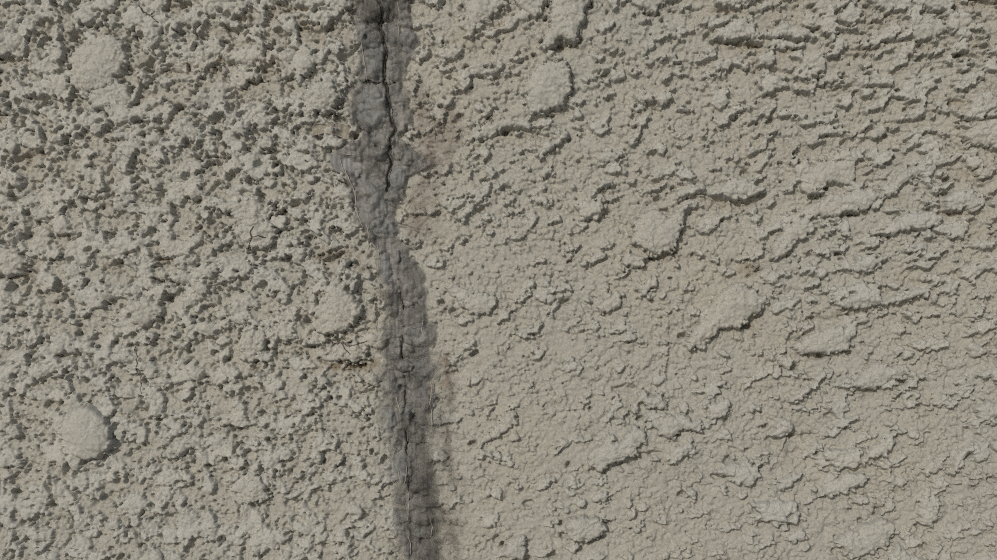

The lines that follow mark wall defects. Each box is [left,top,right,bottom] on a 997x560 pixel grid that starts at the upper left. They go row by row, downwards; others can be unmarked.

crack [360,2,409,191]